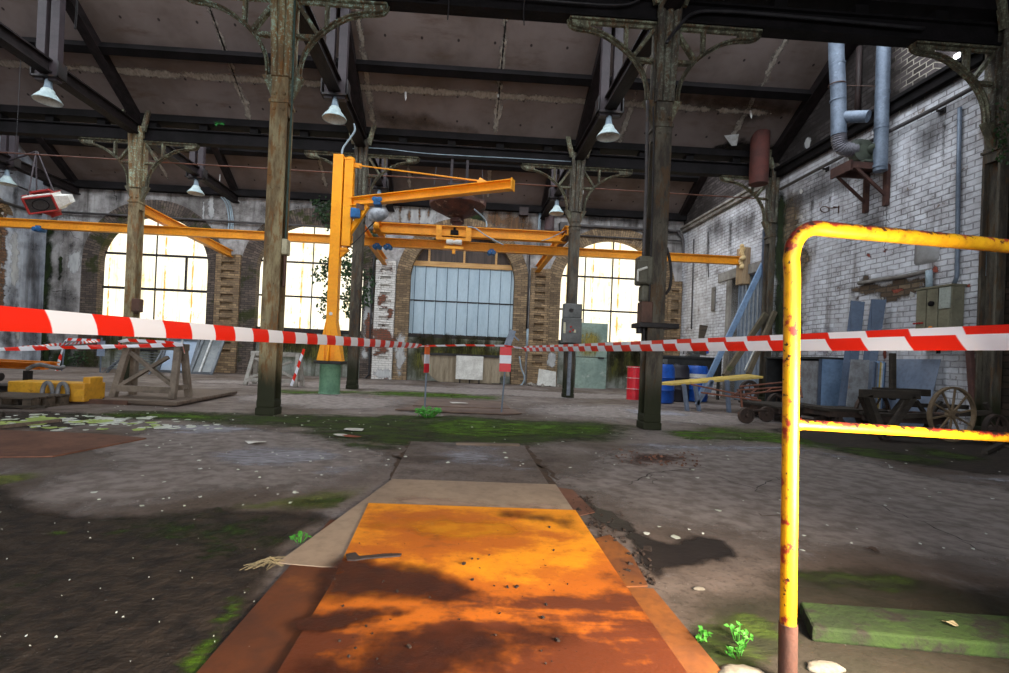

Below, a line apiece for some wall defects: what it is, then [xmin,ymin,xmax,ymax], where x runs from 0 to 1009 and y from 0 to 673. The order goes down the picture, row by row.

peeling [783,189,803,248]
leakage [29,244,38,309]
peeling [800,242,814,303]
spalling [849,266,938,302]
peeling [362,281,405,378]